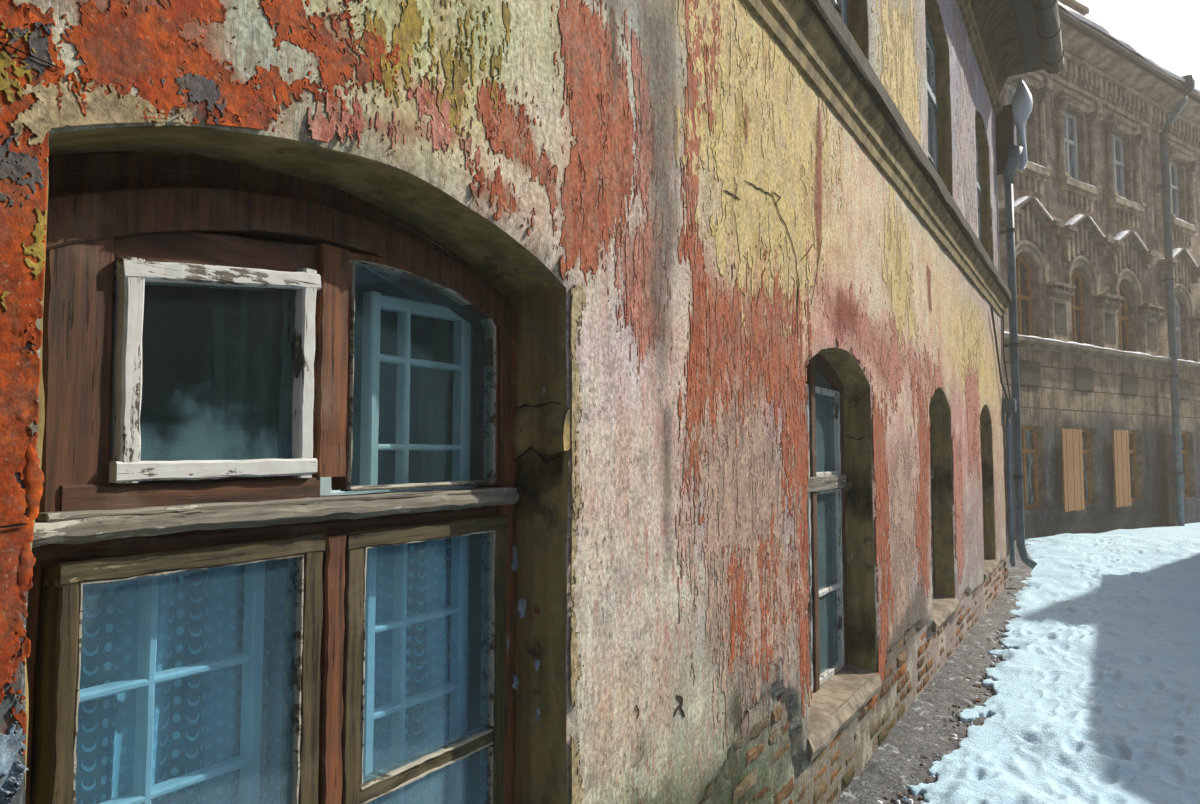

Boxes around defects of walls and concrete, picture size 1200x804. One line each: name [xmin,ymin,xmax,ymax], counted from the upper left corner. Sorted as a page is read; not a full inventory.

peeling [0,0,673,804]
crack [724,180,823,333]
peeling [673,0,1009,804]